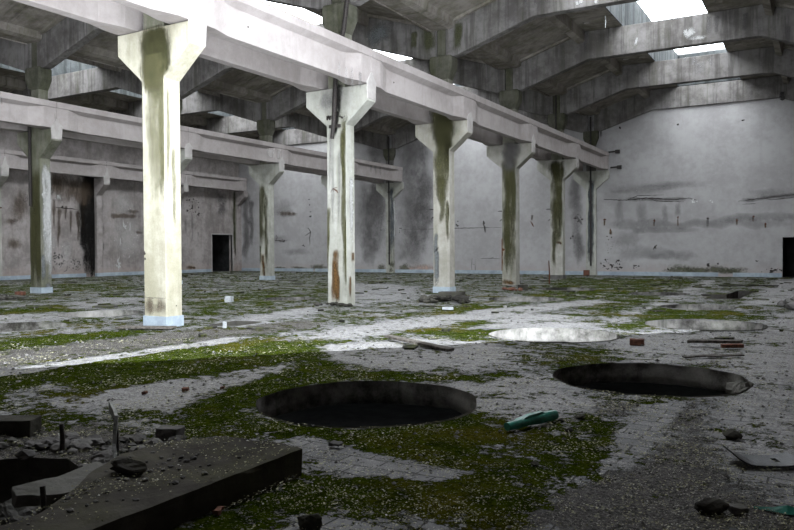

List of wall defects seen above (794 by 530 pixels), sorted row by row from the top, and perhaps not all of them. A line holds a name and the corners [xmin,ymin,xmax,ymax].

damp [51,175,96,276]
damp [365,187,395,246]
damp [407,179,449,250]
damp [503,171,516,263]
damp [552,195,563,263]
damp [574,180,594,258]
rust [332,251,351,299]